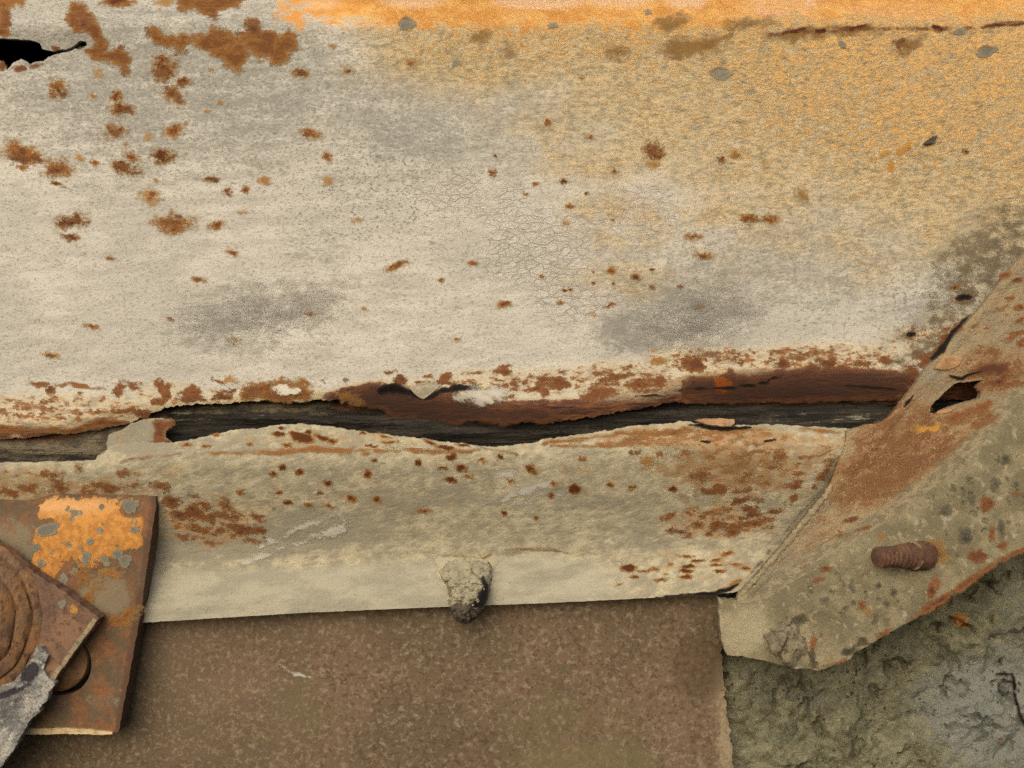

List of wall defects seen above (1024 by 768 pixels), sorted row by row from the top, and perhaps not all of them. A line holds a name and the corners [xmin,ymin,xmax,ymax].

corrosion [64,0,137,77]
corrosion [145,0,309,105]
corrosion [0,139,98,188]
corrosion [90,90,224,235]
peeling [100,418,174,454]
corrosion [0,375,325,434]
peeling [409,382,440,399]
corrosion [336,364,571,426]
spalling [453,386,507,407]
corrosion [680,296,1024,434]
corrosion [0,426,504,547]
corrosion [542,418,839,538]